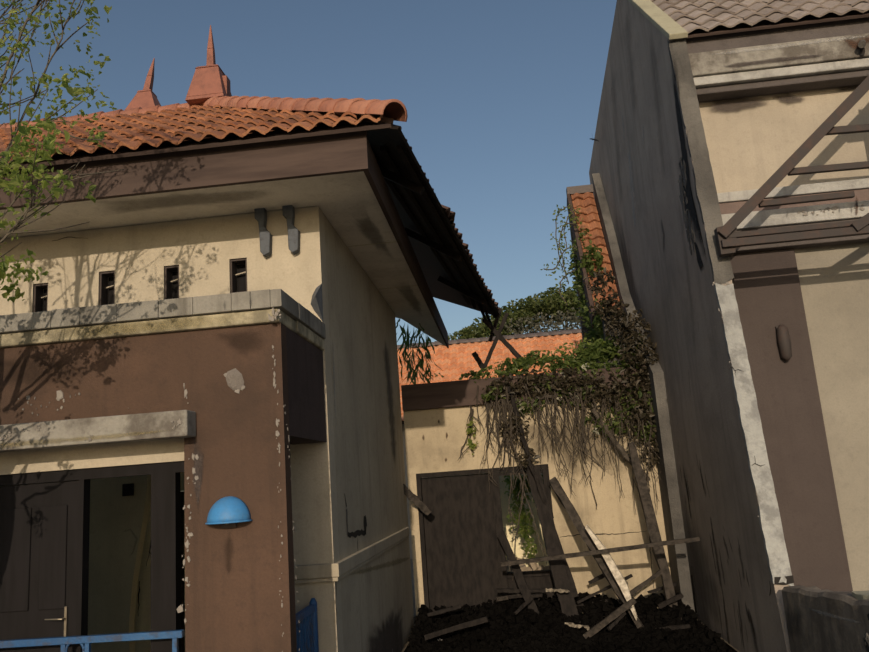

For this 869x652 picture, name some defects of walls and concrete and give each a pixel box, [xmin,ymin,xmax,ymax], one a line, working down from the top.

water stain [673,71,703,270]
peeling [0,390,80,441]
spalling [224,368,245,394]
peeling [272,345,291,467]
peeling [182,453,199,587]